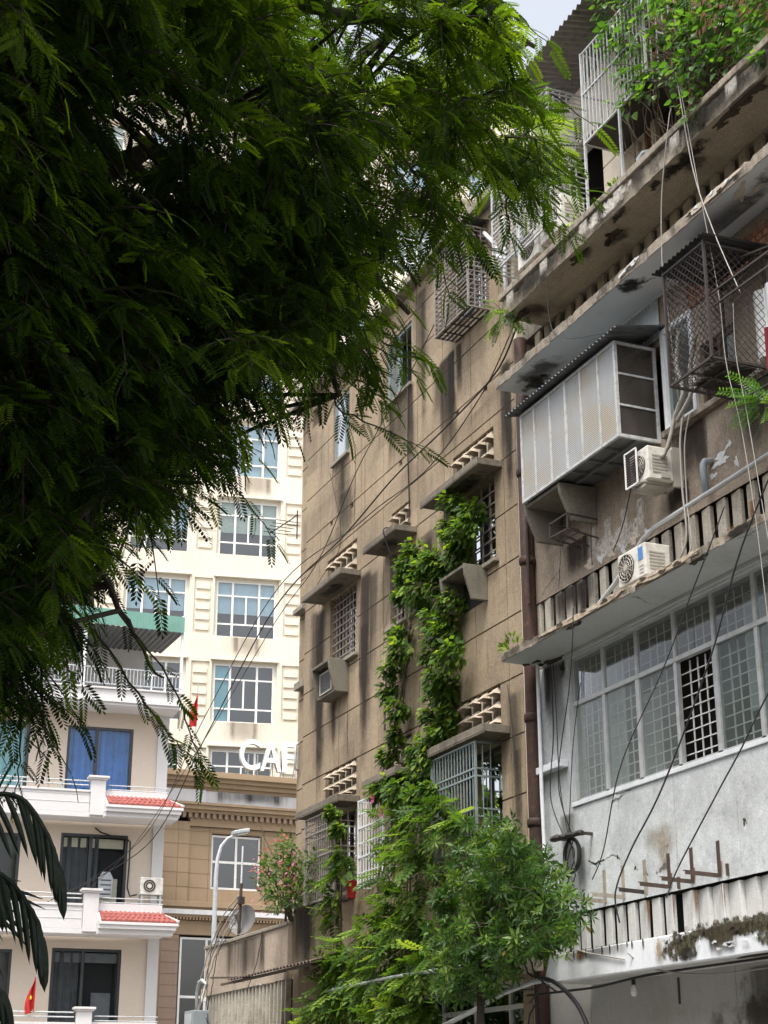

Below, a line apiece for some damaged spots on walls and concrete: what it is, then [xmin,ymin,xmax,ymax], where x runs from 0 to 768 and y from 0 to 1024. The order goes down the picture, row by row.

water stain [664,47,766,181]
water stain [616,277,654,292]
water stain [501,362,557,478]
peeling [710,439,739,480]
water stain [657,912,768,961]